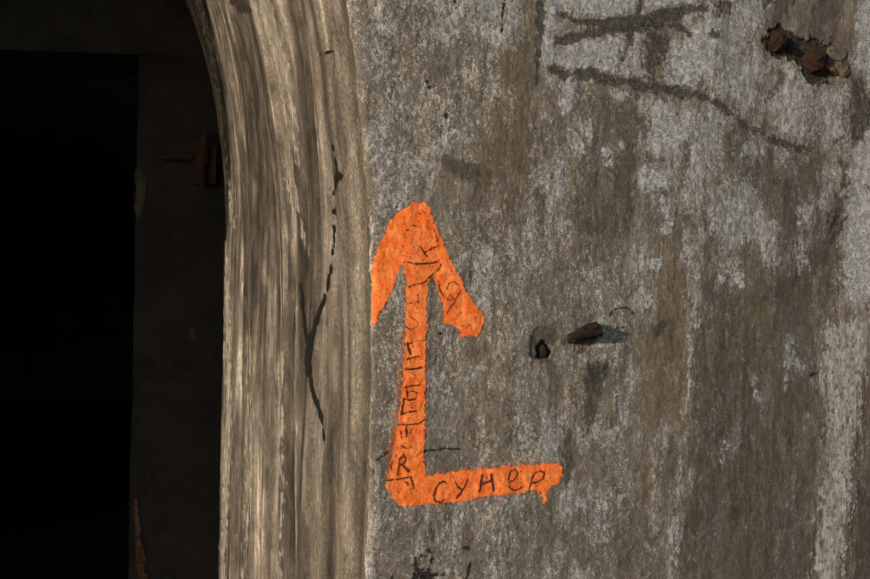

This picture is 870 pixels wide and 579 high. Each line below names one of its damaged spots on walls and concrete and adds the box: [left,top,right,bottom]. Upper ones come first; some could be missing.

crack [295,144,343,441]
damp [663,219,710,579]
damp [803,310,870,579]
damp [824,158,850,245]
damp [832,77,870,144]